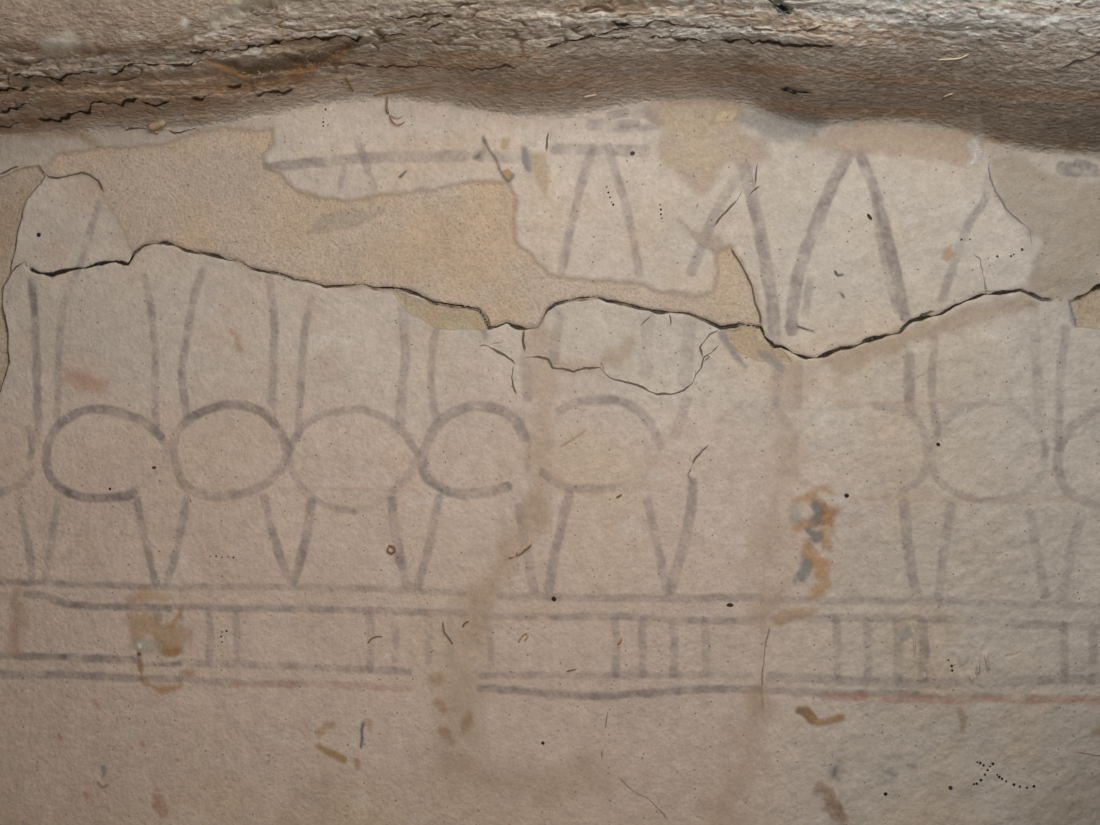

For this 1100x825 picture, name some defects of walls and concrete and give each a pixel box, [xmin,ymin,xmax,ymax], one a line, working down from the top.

crack [0,2,518,134]
crack [548,19,843,48]
crack [782,86,807,94]
crack [1057,50,1100,71]
crack [697,167,759,224]
crack [988,167,1031,236]
spalling [0,127,790,390]
crack [0,209,1100,395]
spalling [1069,288,1100,329]